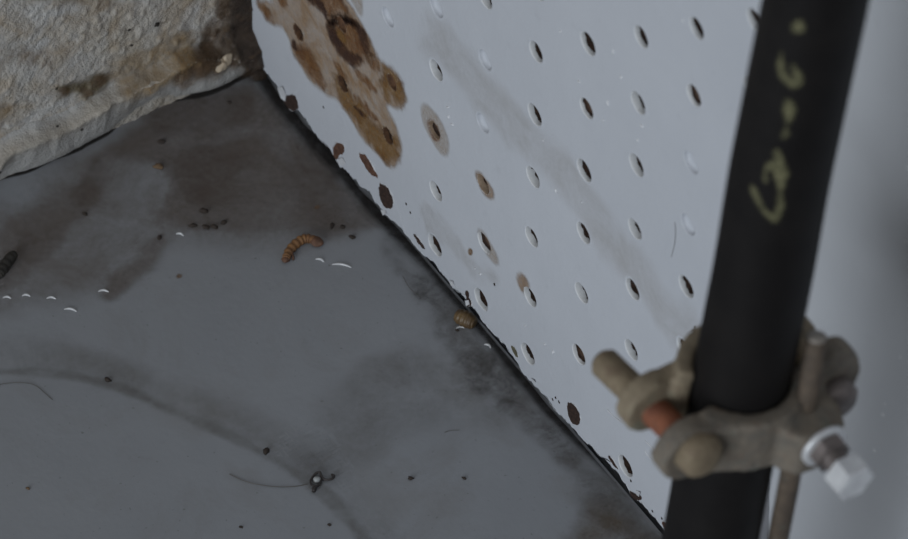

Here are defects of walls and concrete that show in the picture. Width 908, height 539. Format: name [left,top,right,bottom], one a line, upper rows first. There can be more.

water stain [60,76,108,97]
corrosion [258,0,405,166]